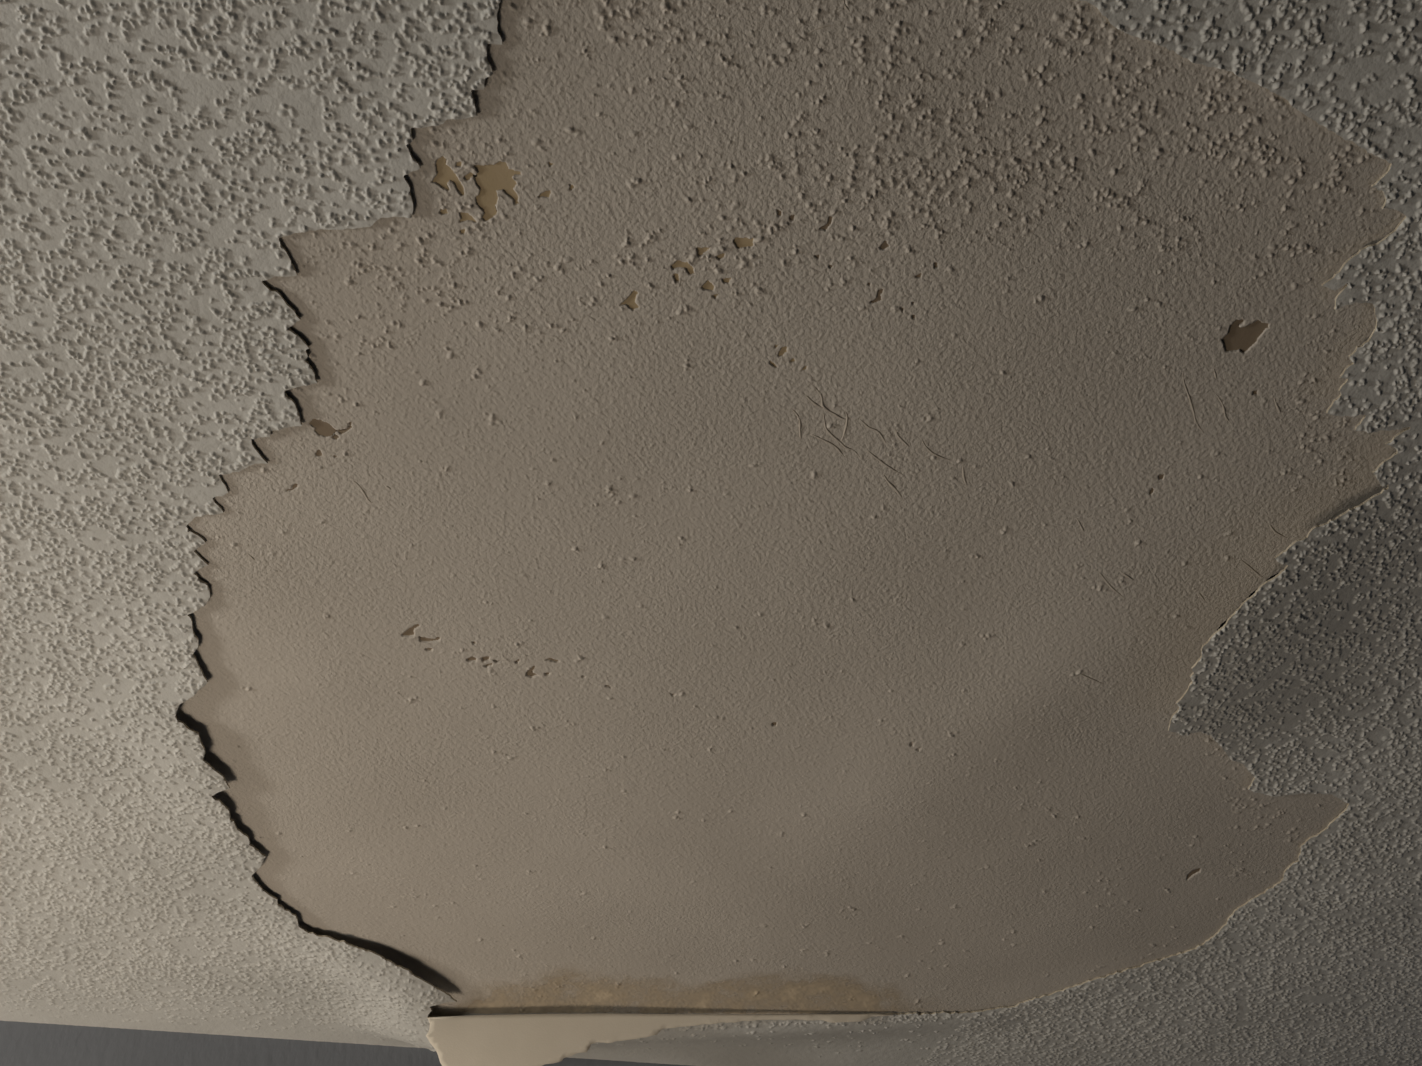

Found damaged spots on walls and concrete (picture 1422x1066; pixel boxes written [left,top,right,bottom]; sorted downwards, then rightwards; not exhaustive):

spalling [432,156,464,195]
spalling [464,161,521,221]
spalling [1221,319,1268,352]
spalling [309,419,352,437]
peeling [894,878,1283,1015]
peeling [273,900,894,1066]
leakage [468,978,898,1014]